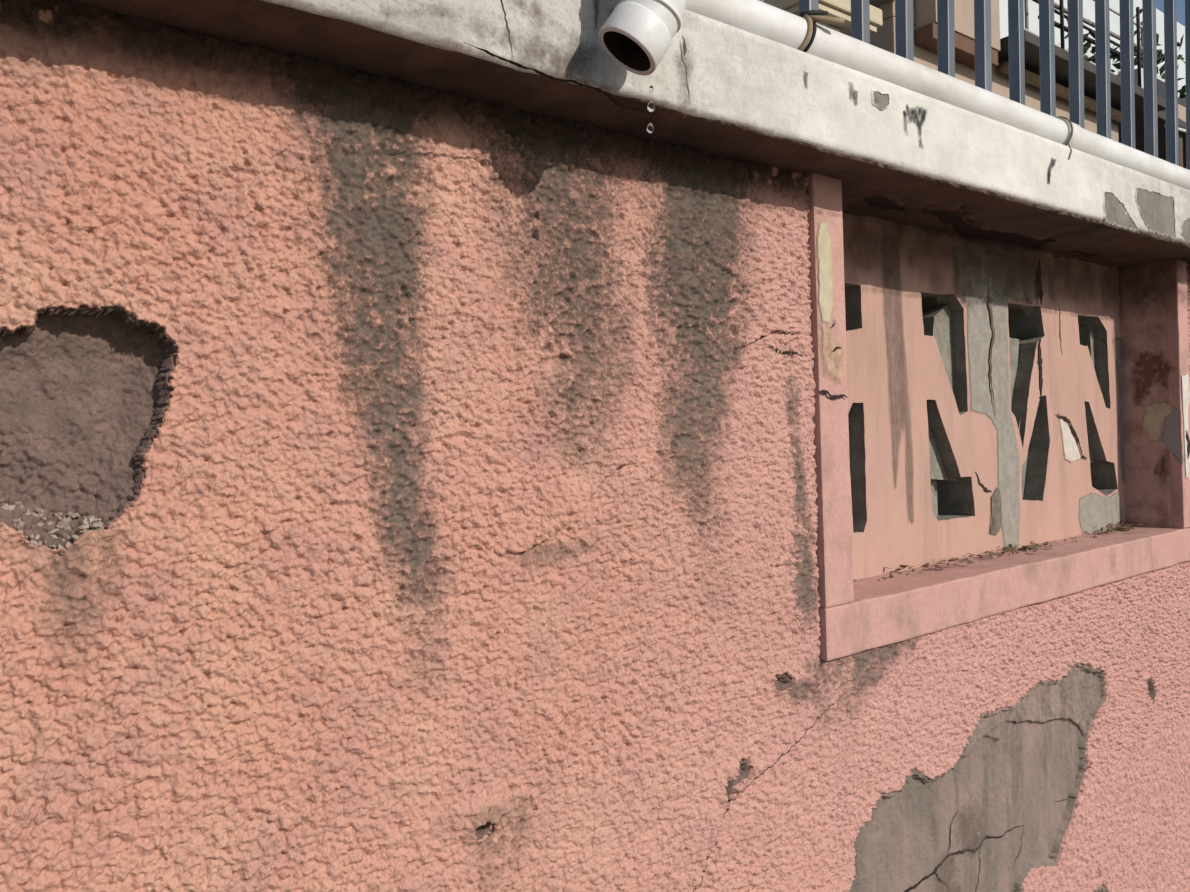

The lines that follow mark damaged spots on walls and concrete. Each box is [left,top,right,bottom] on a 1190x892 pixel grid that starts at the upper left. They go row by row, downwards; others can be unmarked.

crack [464,0,691,116]
peeling [1103,186,1190,244]
leakage [0,0,809,602]
spalling [0,305,177,555]
peeling [968,293,1020,551]
peeling [1059,417,1082,463]
peeling [1134,353,1190,478]
leakage [787,396,817,621]
flaking render [849,662,1106,892]
crack [1005,718,1087,738]
spalling [1146,678,1156,704]
crack [904,811,1024,892]